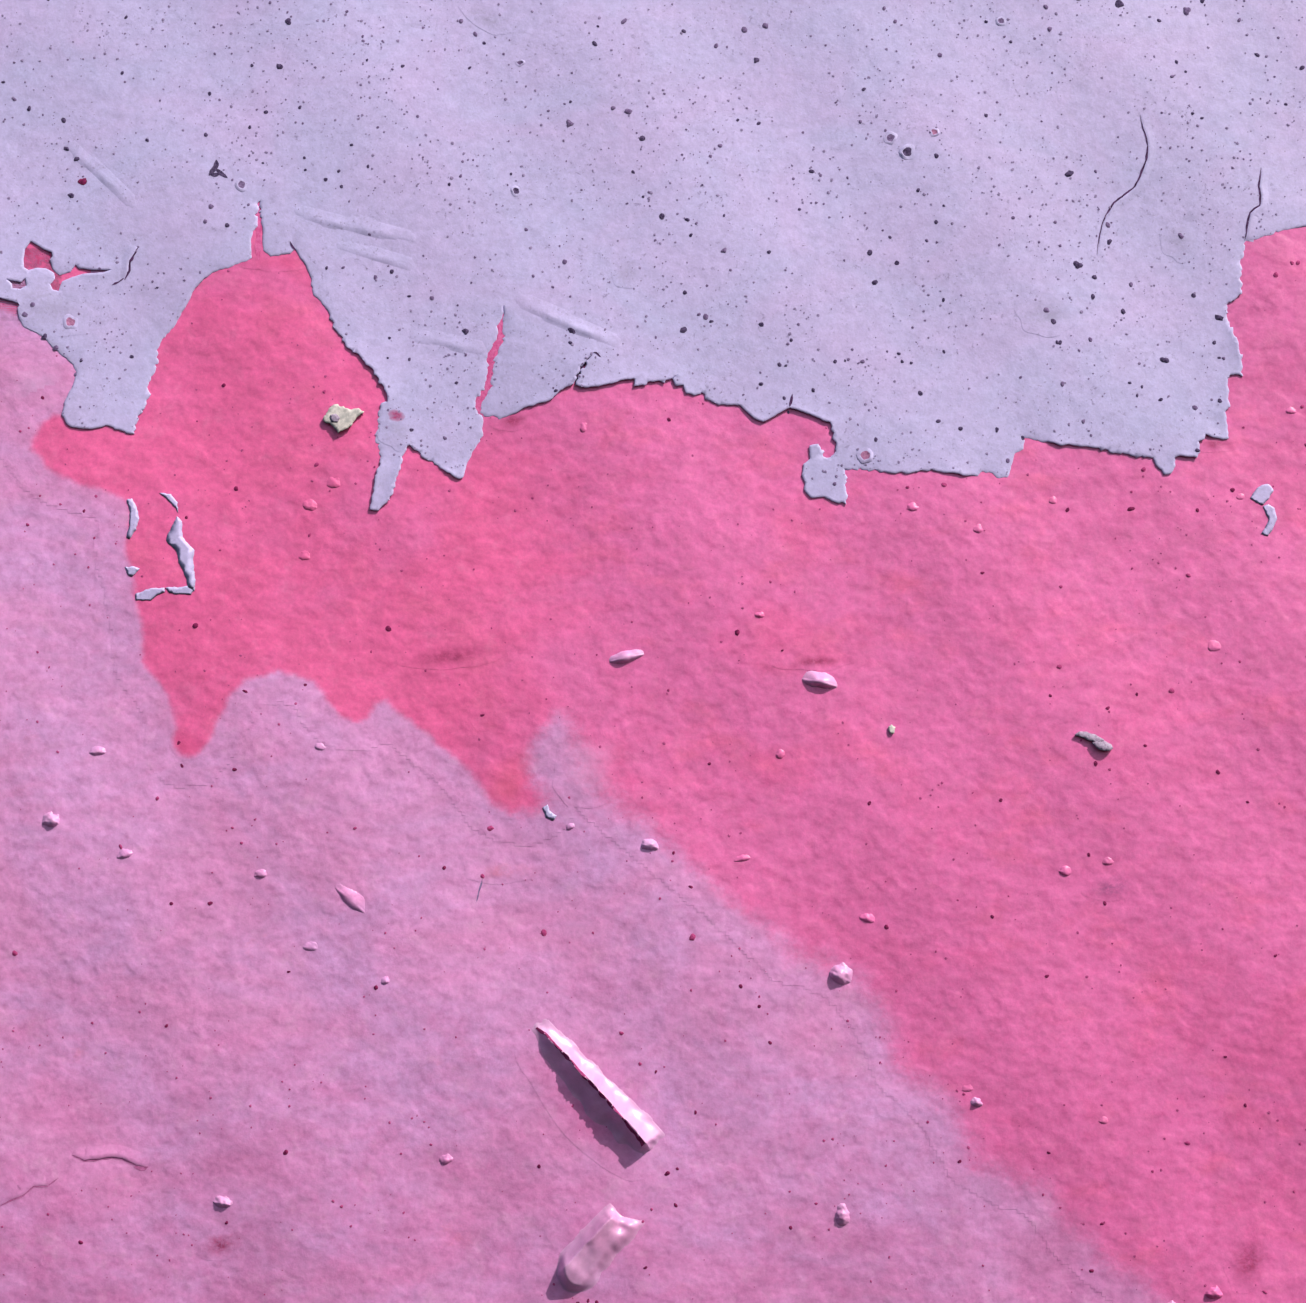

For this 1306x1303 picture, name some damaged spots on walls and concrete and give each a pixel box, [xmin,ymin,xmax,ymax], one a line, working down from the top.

crack [1097,113,1156,257]
crack [1245,168,1270,242]
peeling [0,242,108,343]
peeling [323,404,364,433]
peeling [126,498,139,539]
peeling [160,493,178,512]
peeling [1251,484,1274,505]
peeling [1261,504,1277,536]
peeling [166,517,196,591]
peeling [135,588,165,601]
peeling [165,586,193,595]
peeling [1075,731,1113,751]